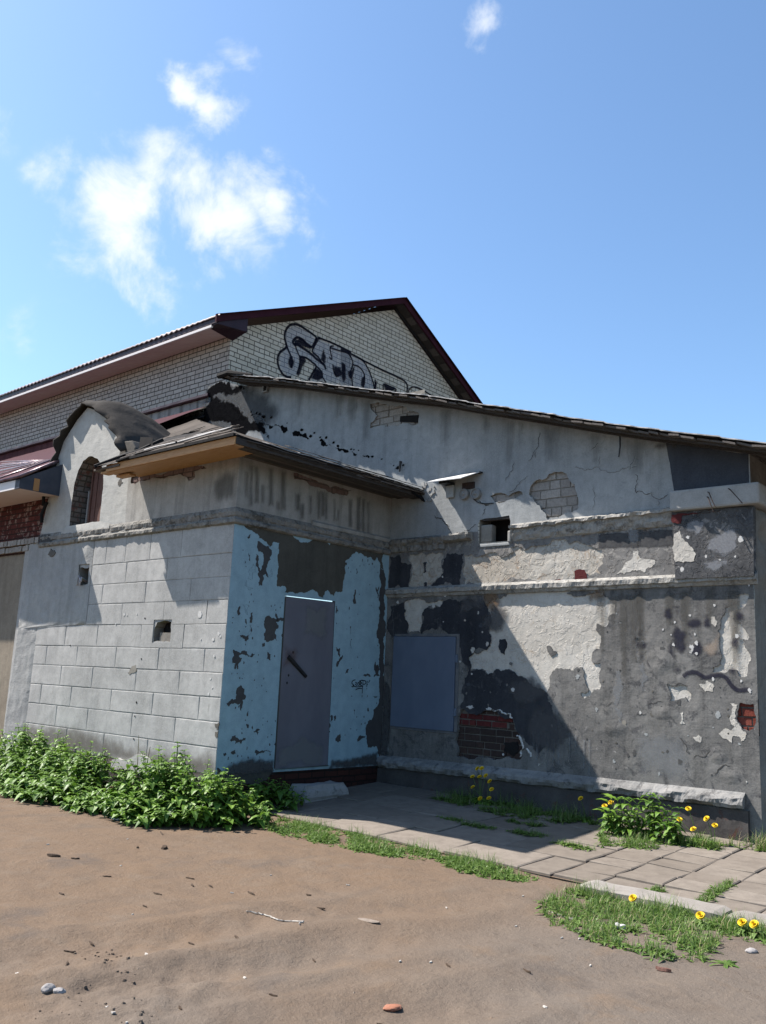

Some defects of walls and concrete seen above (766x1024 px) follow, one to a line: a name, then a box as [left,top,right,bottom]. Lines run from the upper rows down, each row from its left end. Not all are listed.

flaking render [371,403,419,428]
flaking render [491,472,579,519]
crack [574,443,668,510]
peeling [617,551,655,574]
peeling [671,509,744,572]
peeling [215,526,615,768]
peeling [668,584,760,743]